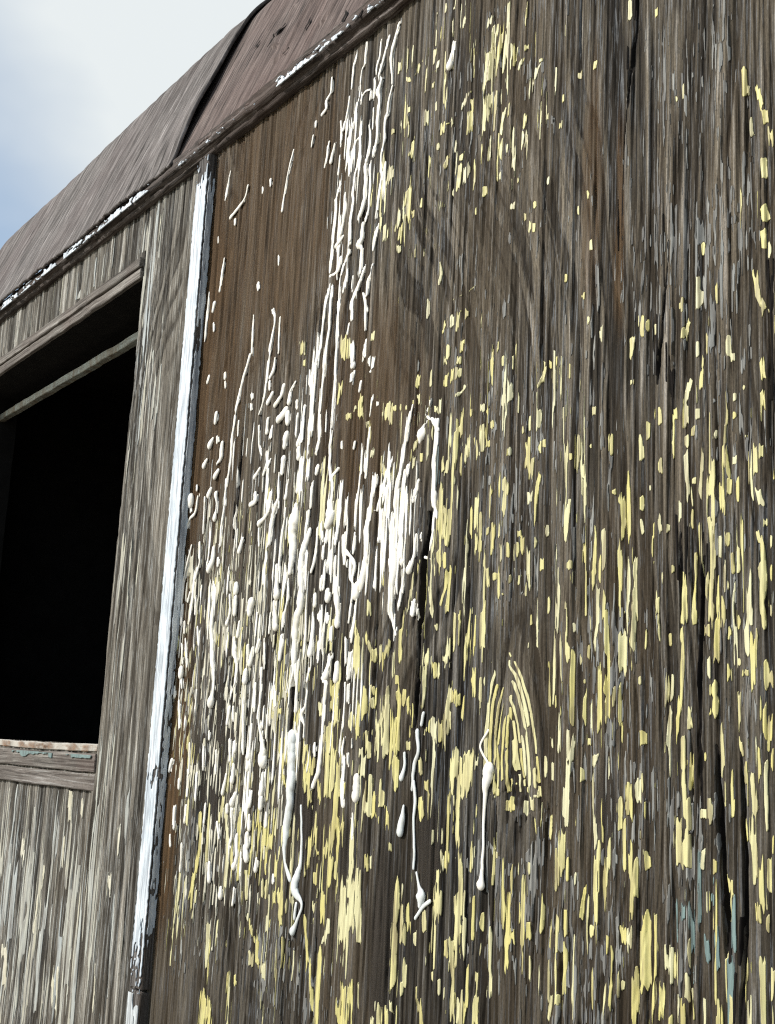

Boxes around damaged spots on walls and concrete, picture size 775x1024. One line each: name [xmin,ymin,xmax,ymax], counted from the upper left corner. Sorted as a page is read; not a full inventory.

peeling [275,0,383,87]
crack [617,0,640,251]
peeling [126,155,420,1024]
crack [414,511,432,732]
peeling [370,0,775,1024]
crack [675,514,749,1024]